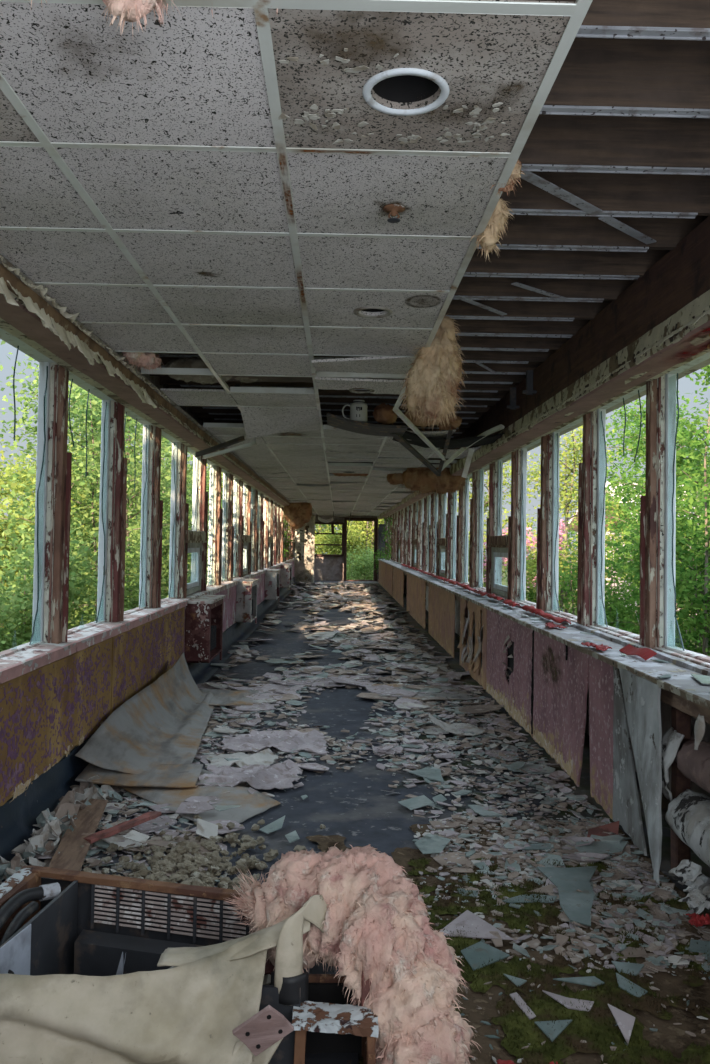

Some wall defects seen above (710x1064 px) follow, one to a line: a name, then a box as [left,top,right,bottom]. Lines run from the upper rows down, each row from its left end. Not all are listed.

peeling [319,48,383,73]
peeling [279,104,373,144]
peeling [436,102,512,145]
peeling [0,255,171,408]
spalling [600,411,608,627]
peeling [0,366,209,803]
peeling [486,682,573,778]